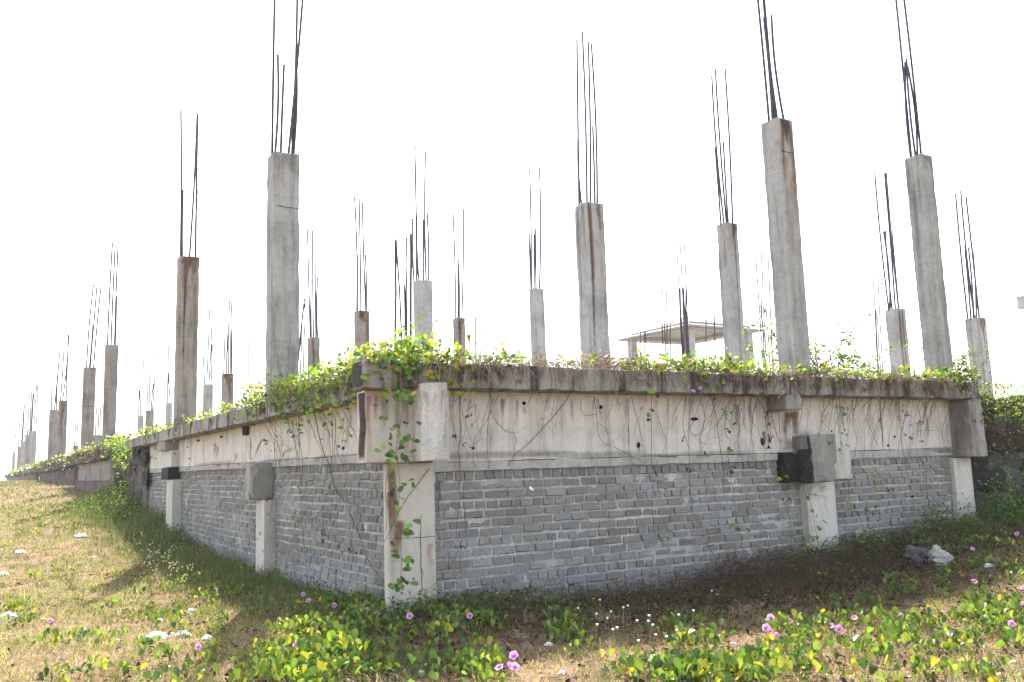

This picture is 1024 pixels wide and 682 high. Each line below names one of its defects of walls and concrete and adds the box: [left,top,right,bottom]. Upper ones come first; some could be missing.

corrosion [781,118,794,165]
corrosion [588,205,601,343]
corrosion [358,392,378,458]
corrosion [387,470,403,545]